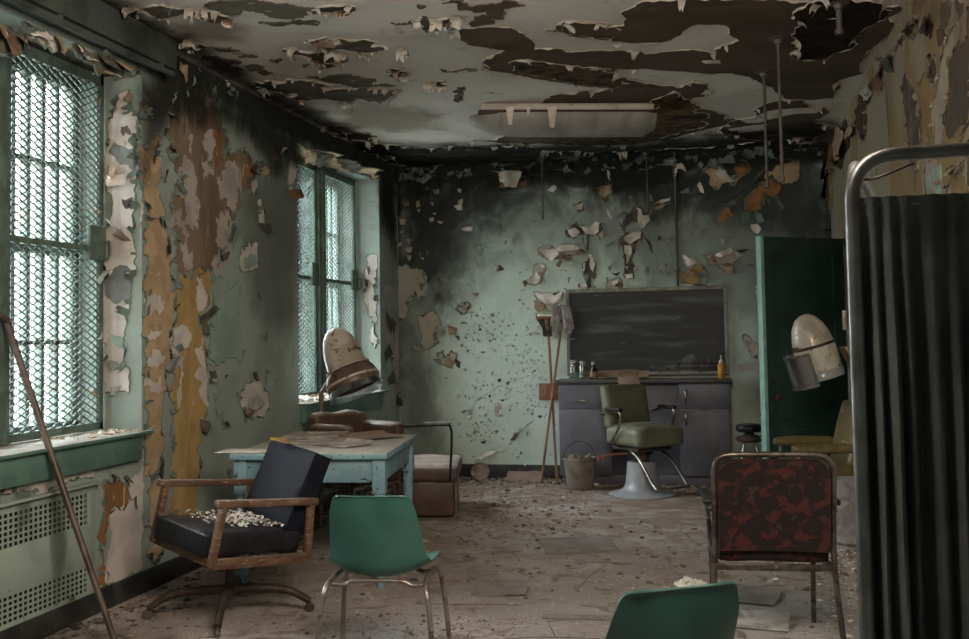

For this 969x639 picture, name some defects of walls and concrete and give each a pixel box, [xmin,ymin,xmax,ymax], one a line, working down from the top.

peeling [0,21,472,565]
peeling [122,0,359,28]
damp [101,0,835,300]
spalling [362,0,969,466]